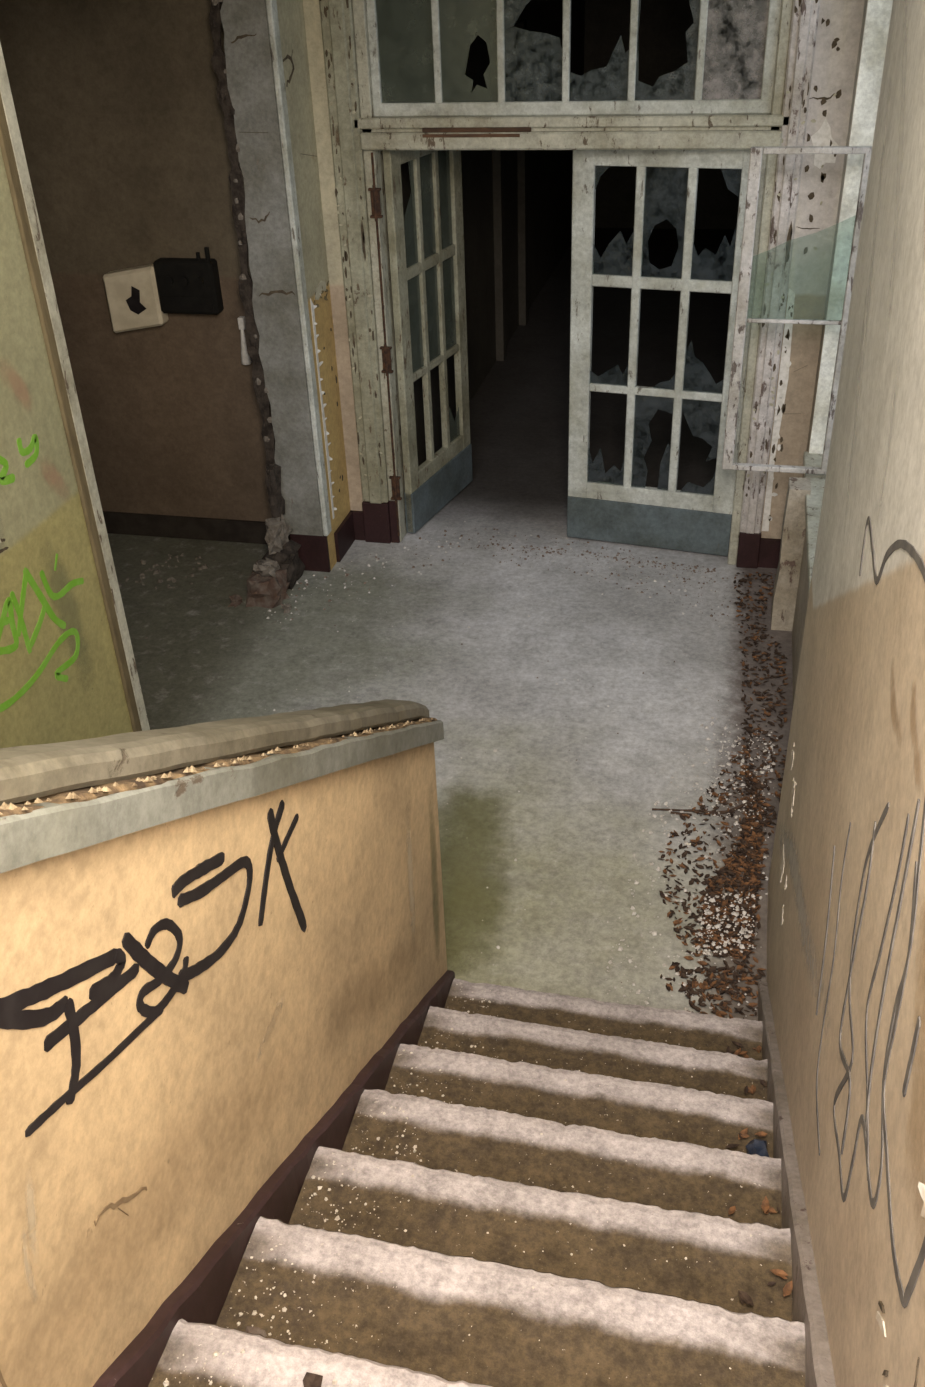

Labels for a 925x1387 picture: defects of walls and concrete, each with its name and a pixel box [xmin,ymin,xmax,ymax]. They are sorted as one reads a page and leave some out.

peeling [794,0,840,51]
peeling [786,82,842,222]
spalling [209,0,305,613]
peeling [745,190,818,531]
crack [94,1187,147,1226]
crack [0,1370,8,1387]